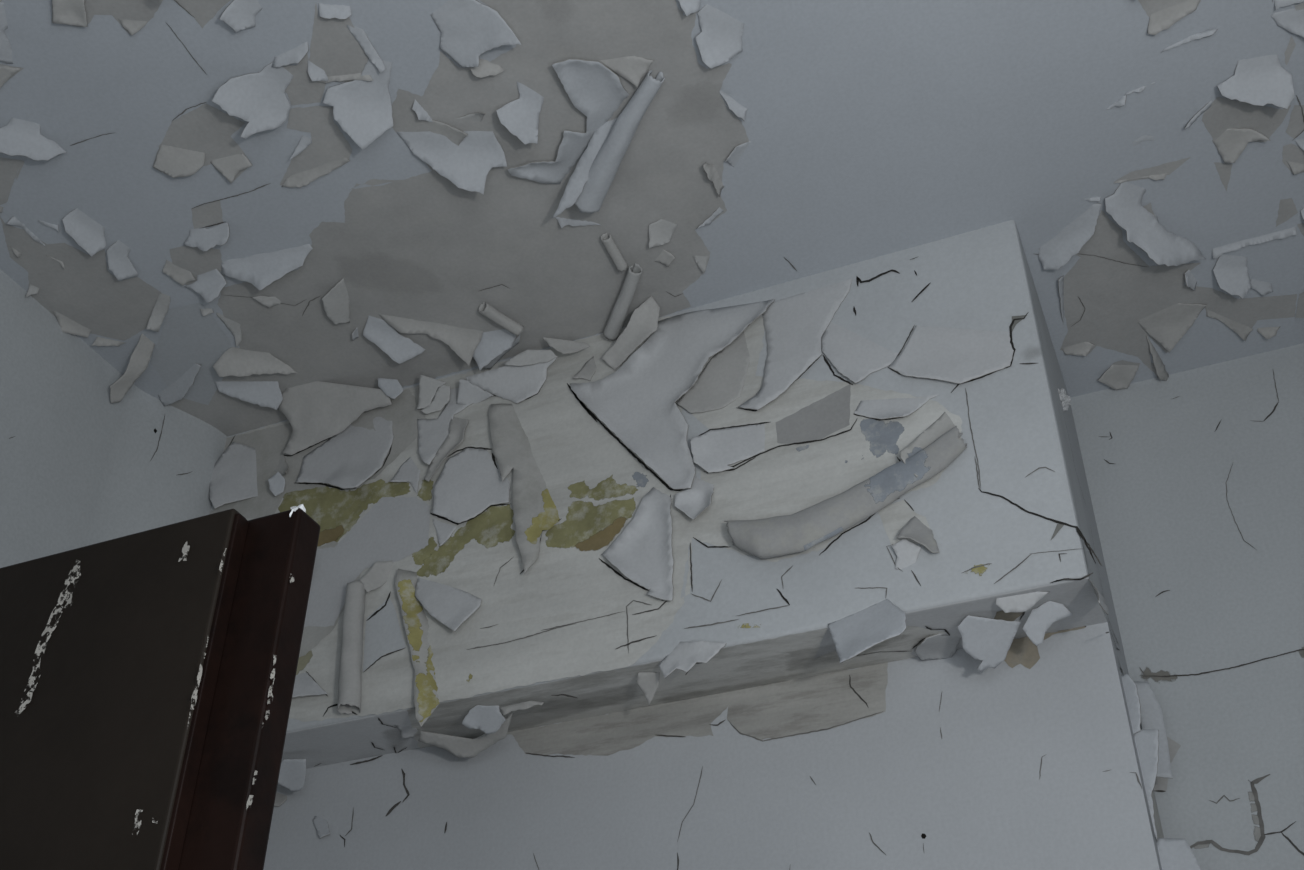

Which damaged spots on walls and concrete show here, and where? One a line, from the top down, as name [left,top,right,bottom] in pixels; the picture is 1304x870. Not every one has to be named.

peeling [1184,0,1304,192]
peeling [1036,157,1304,381]
peeling [0,0,1086,765]
peeling [1110,630,1201,870]
crack [1139,647,1304,682]
crack [1190,774,1304,856]